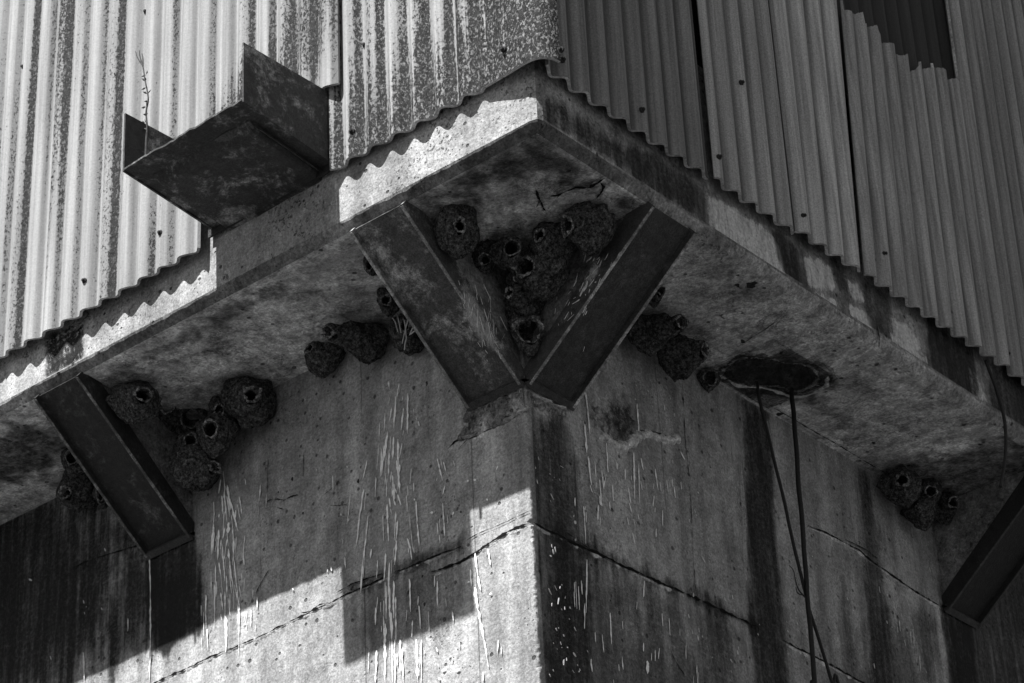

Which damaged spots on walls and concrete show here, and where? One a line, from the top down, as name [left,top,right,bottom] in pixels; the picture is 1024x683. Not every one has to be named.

crack [154,384,758,683]
leakage [533,393,682,683]
crack [808,525,941,609]